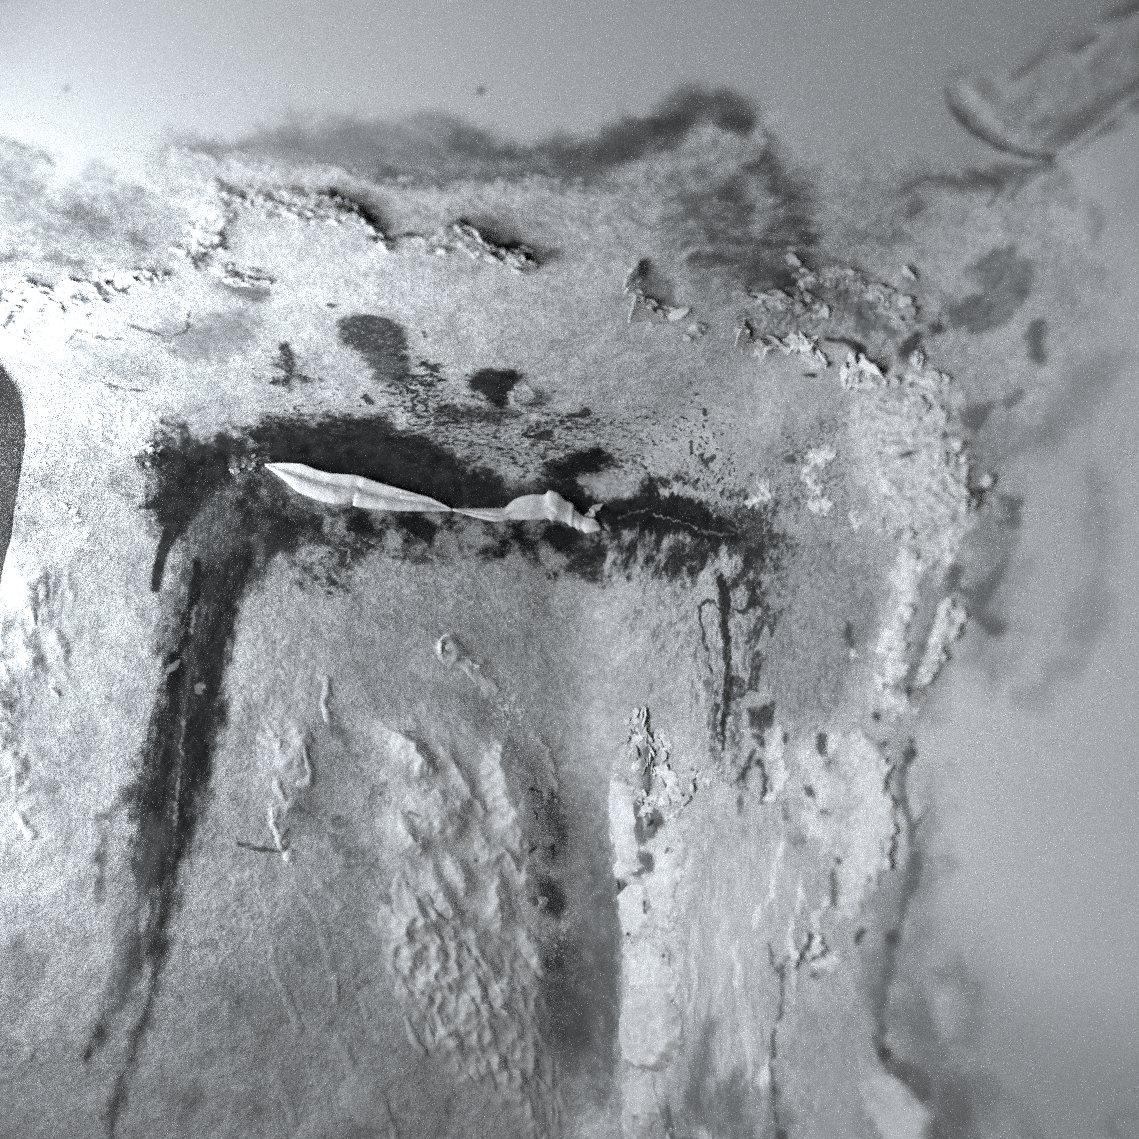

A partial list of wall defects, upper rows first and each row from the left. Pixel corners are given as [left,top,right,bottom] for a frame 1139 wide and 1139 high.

peeling [0,263,170,347]
peeling [158,145,716,343]
leakage [601,93,751,161]
leakage [666,134,820,292]
peeling [732,245,947,393]
leakage [62,315,1021,1106]
peeling [608,704,711,1139]
peeling [763,725,897,978]
crack [768,942,790,1139]
peeling [857,1038,933,1139]